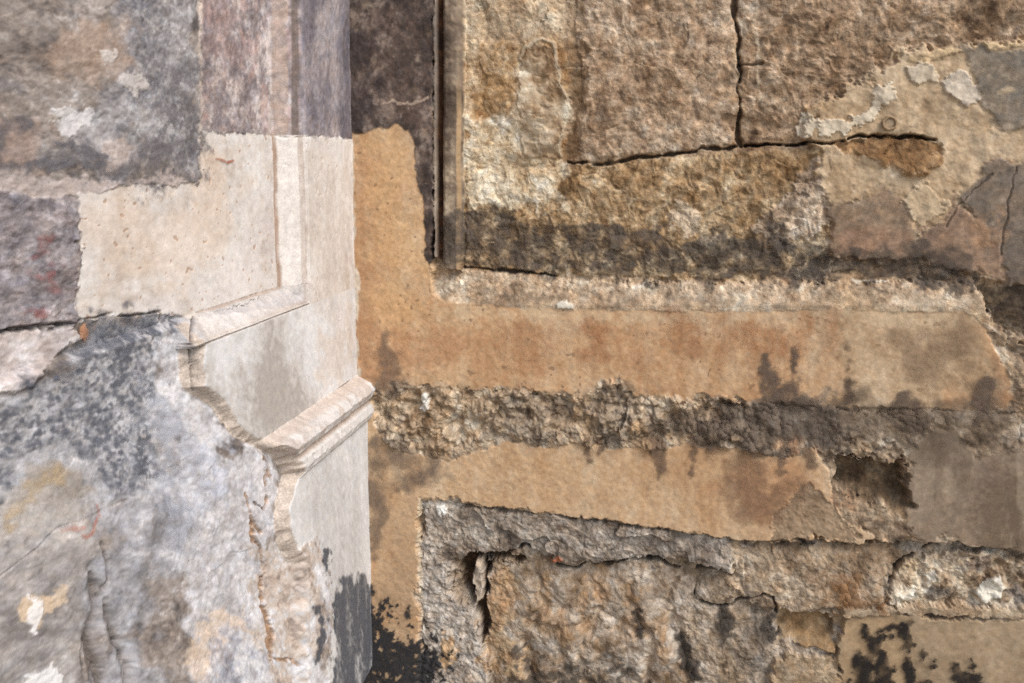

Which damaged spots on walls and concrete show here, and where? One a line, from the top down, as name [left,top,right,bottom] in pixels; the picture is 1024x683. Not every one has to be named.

crack [567,0,847,166]
flaking render [905,61,982,107]
spalling [795,80,944,176]
damp [769,222,825,274]
crack [3,310,161,330]
peeling [419,392,431,411]
damp [583,438,602,463]
damp [649,437,667,479]
damp [665,348,1016,519]
peeling [436,504,448,517]
crack [244,453,300,666]
spalling [462,550,524,636]